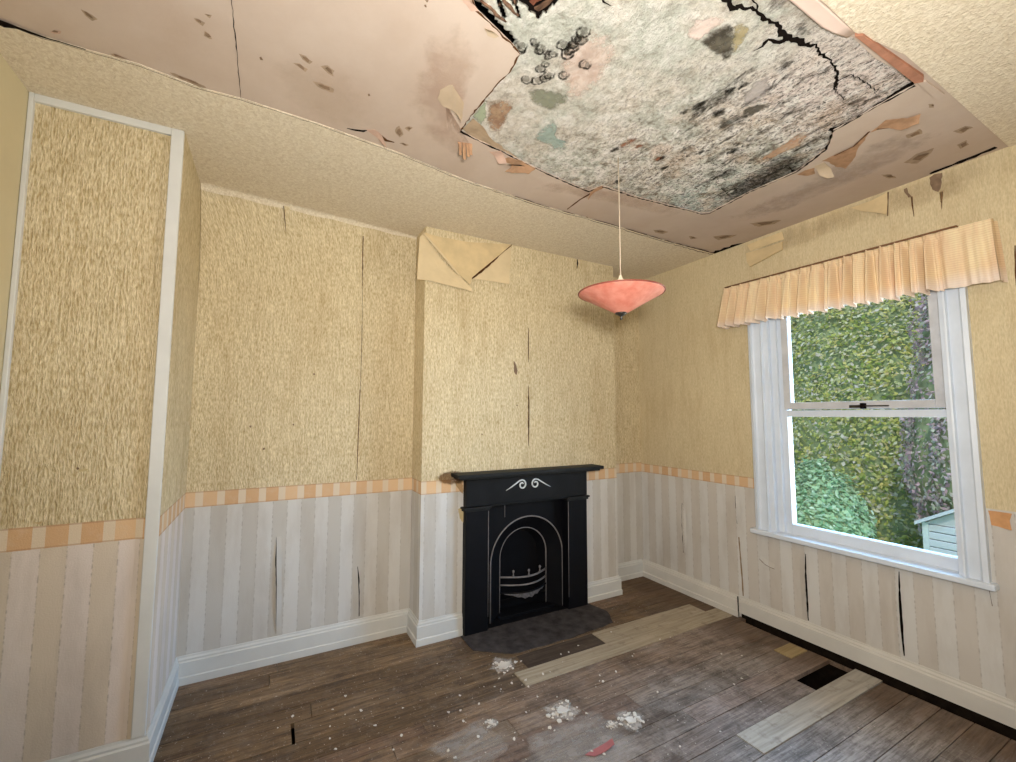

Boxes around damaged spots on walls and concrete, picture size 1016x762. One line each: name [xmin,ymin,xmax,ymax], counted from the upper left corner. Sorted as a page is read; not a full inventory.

crack [231,0,241,98]
peeling [294,54,334,93]
flaking render [437,0,934,214]
crack [721,0,876,103]
peeling [953,126,973,149]